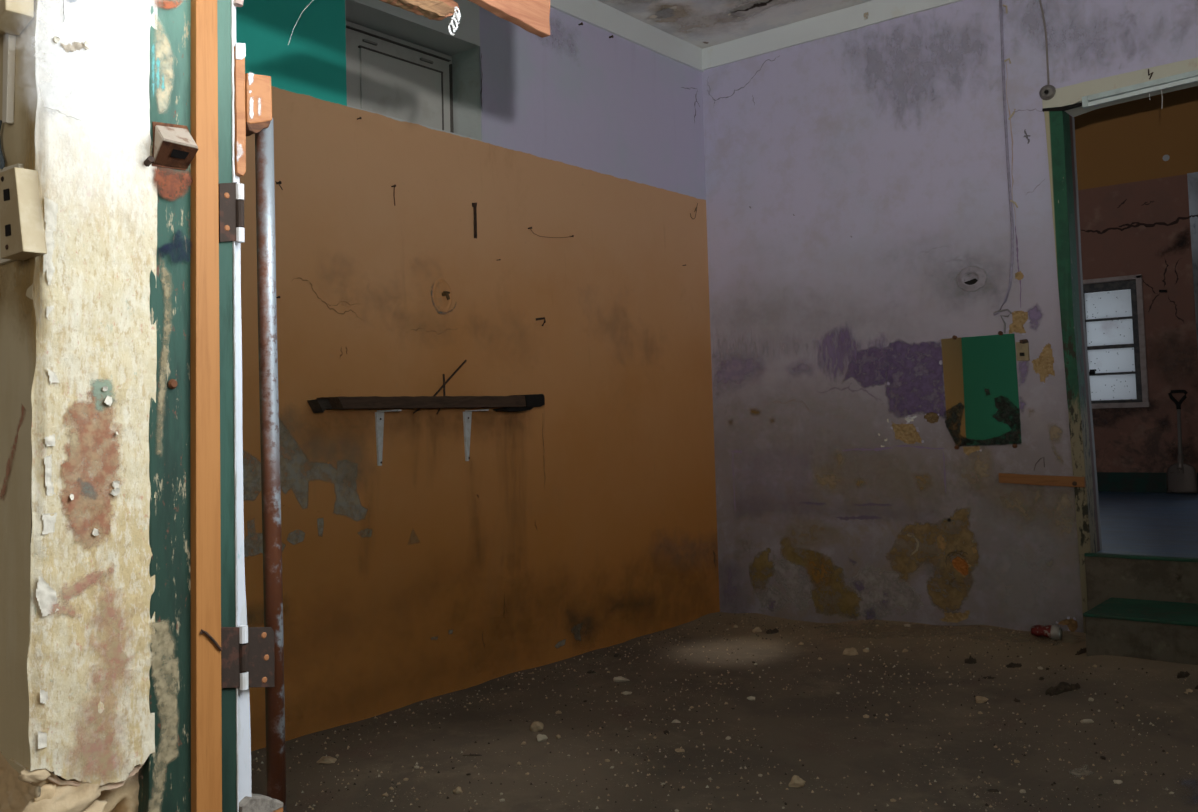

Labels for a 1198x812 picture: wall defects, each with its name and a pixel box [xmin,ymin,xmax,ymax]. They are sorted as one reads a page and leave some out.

peeling [155,16,173,112]
crack [681,56,779,123]
crack [703,0,794,44]
spalling [43,196,58,285]
crack [1081,199,1198,234]
peeling [817,328,946,447]
peeling [42,380,120,549]
peeling [243,451,261,500]
peeling [279,420,372,551]
peeling [244,520,263,559]
spalling [0,593,144,812]